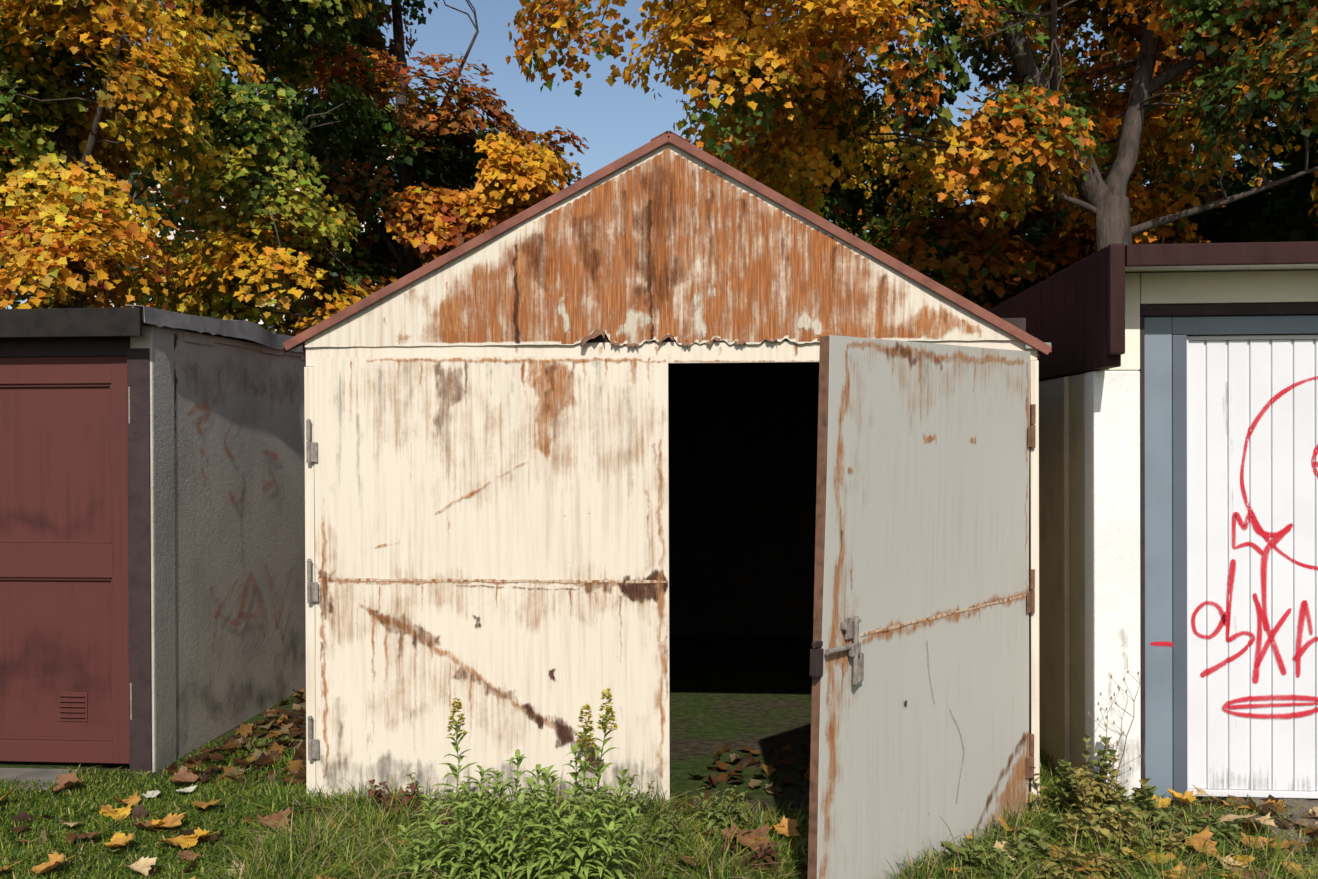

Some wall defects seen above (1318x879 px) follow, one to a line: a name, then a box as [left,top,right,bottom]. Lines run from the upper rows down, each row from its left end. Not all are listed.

rust [319,522,668,777]
rust [380,148,1030,829]